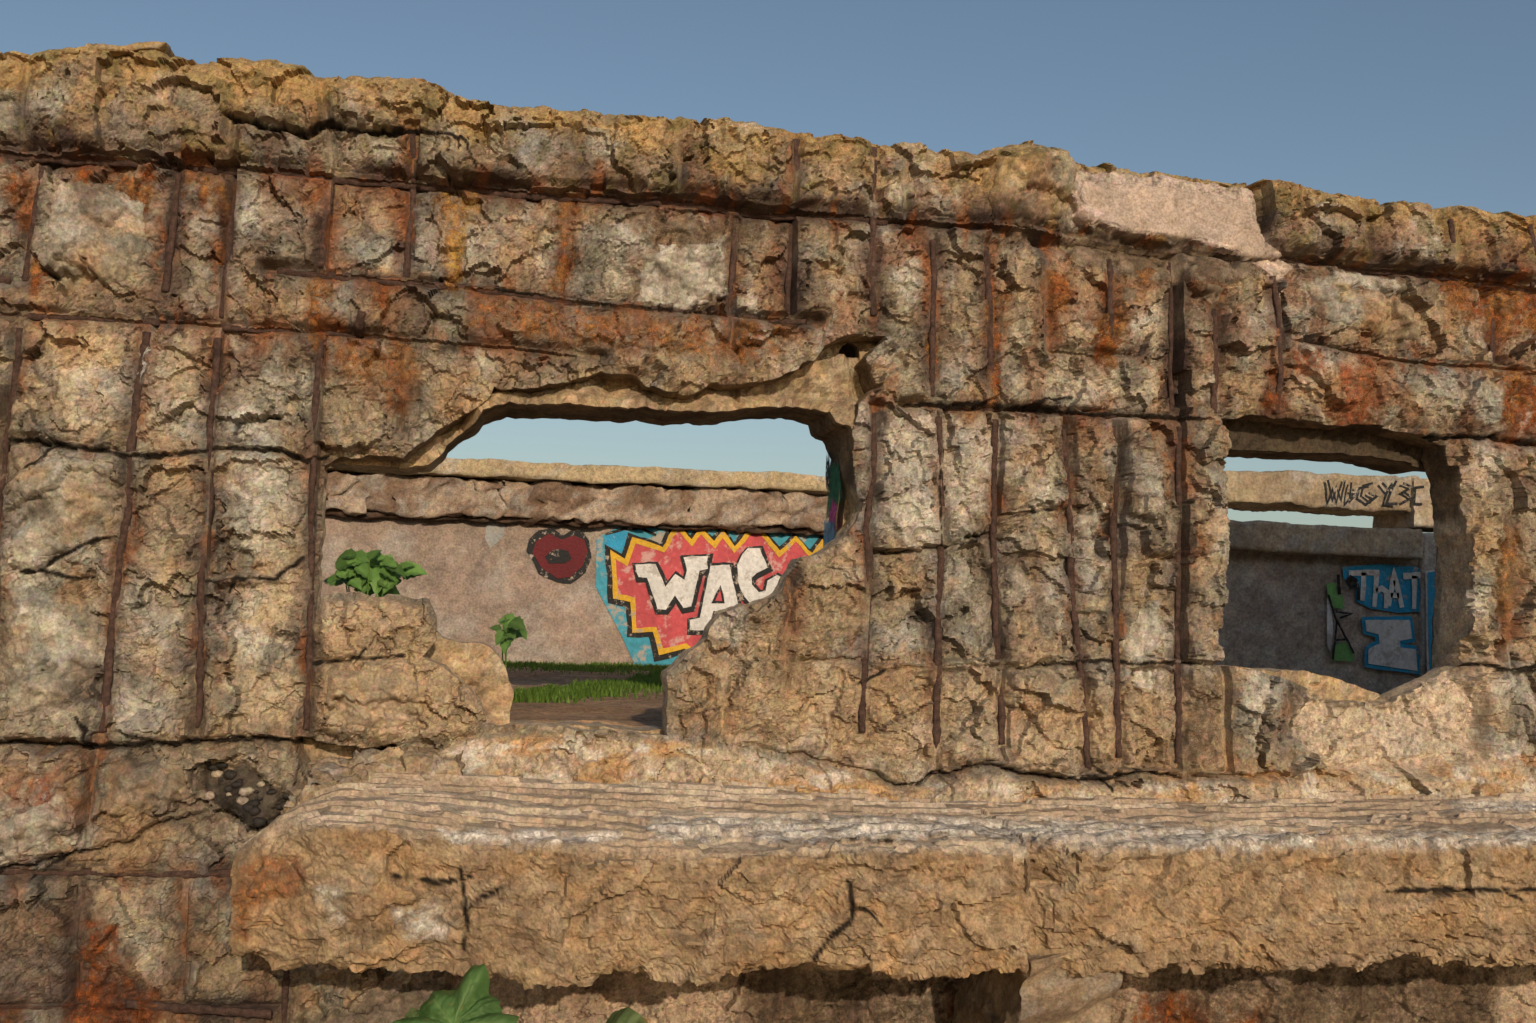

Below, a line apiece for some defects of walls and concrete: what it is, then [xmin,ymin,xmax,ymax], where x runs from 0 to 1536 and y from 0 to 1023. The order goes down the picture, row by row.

corrosion [77,166,155,213]
corrosion [442,192,475,289]
corrosion [472,203,778,362]
corrosion [1432,279,1536,349]
corrosion [1485,368,1536,445]
flaking render [904,180,1536,770]
crack [20,537,110,579]
crack [0,716,317,749]
spalling [204,761,289,828]
crack [0,848,86,879]
corrosion [67,921,160,1023]